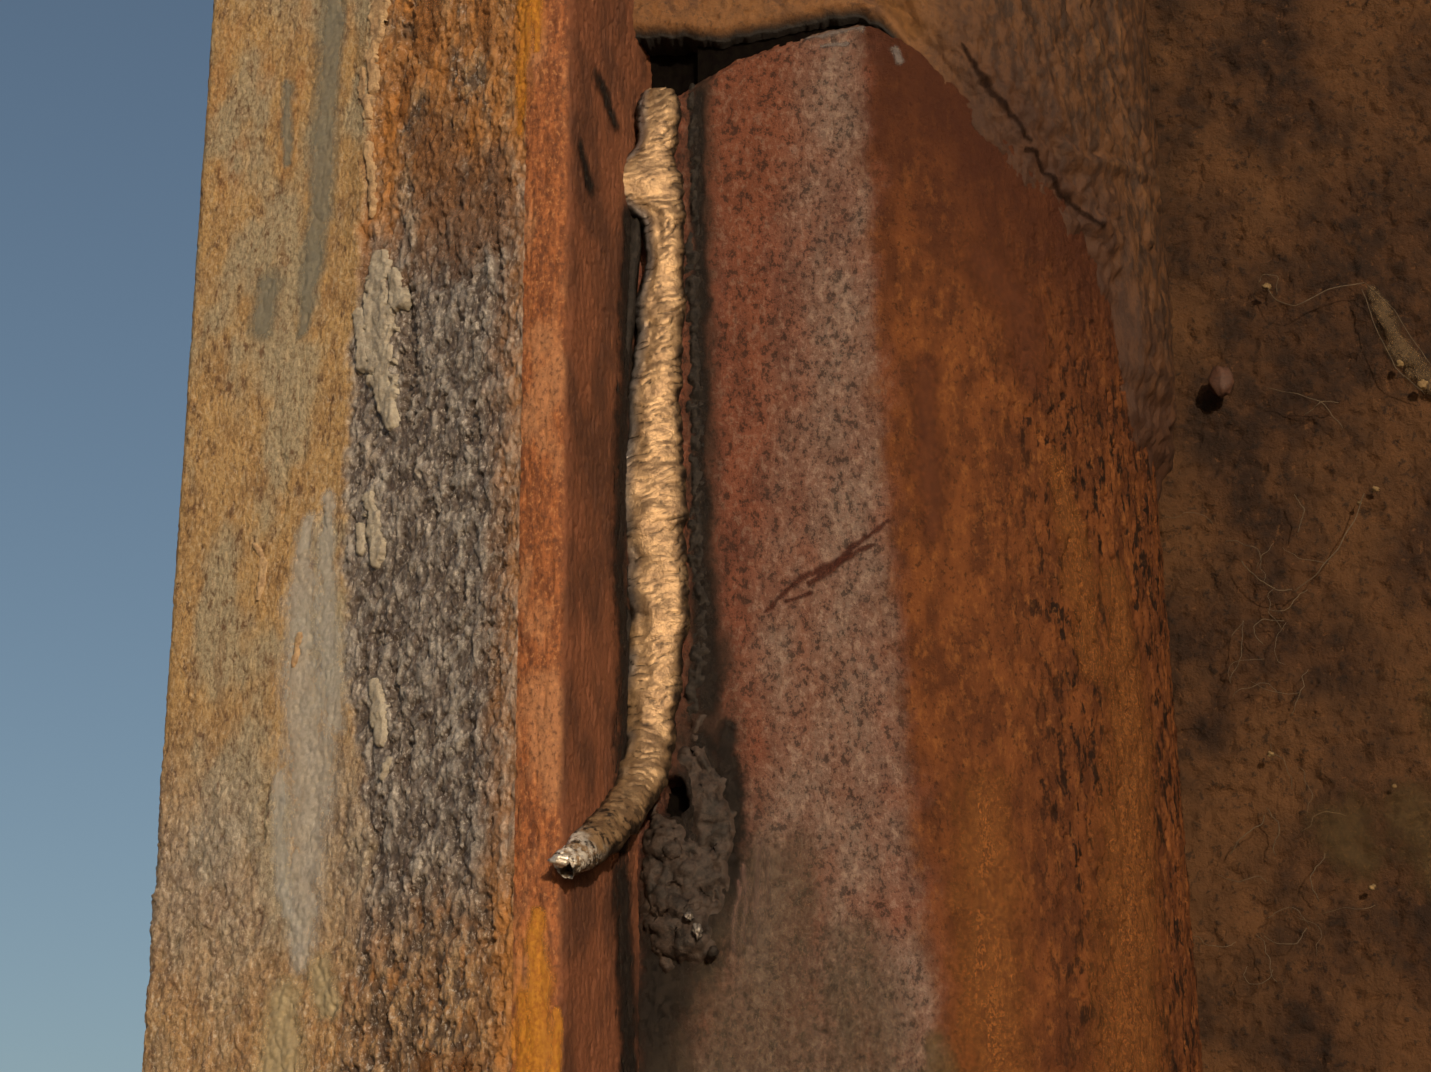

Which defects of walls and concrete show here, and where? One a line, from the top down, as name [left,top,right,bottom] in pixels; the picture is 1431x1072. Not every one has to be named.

rust [515,0,540,136]
crack [962,43,1105,228]
peeling [387,267,413,313]
peeling [355,522,368,556]
peeling [378,756,392,781]
rust [516,907,563,1072]